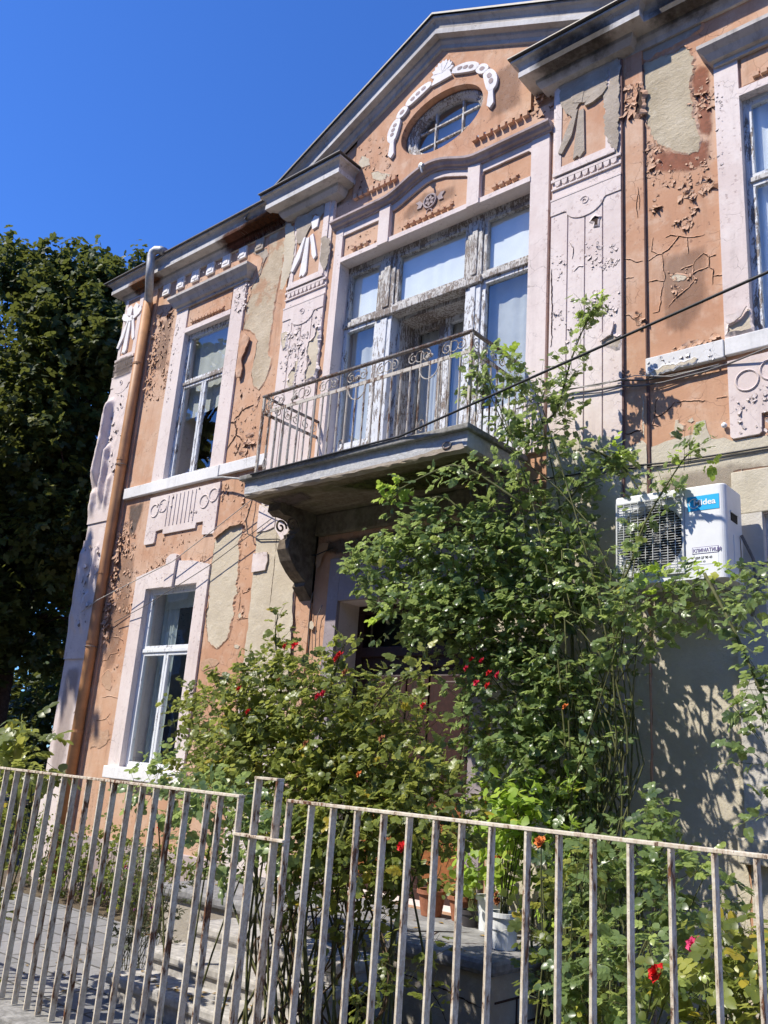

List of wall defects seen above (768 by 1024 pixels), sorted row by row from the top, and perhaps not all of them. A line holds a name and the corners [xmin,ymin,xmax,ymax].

peeling [530,22,724,232]
peeling [143,305,180,408]
crack [226,404,253,456]
peeling [176,204,324,458]
crack [624,234,722,320]
peeling [646,306,755,376]
peeling [100,519,190,691]
peeling [156,482,294,701]